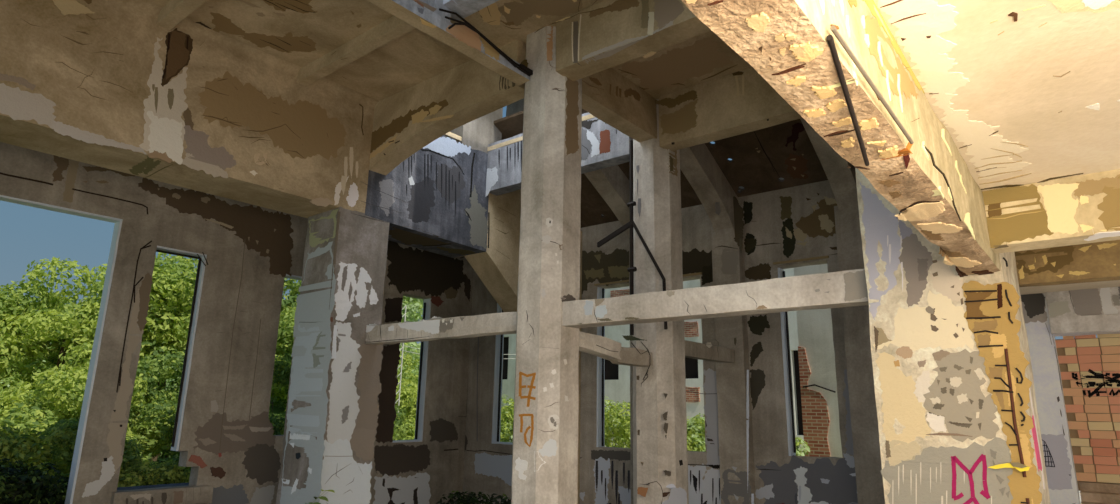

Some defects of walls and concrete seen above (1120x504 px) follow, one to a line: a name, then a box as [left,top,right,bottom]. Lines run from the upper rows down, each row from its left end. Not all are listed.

spalling [161,28,193,86]
peeling [745,12,823,62]
crack [824,129,855,137]
peeling [786,76,899,158]
crack [847,164,903,176]
crack [899,147,961,221]
crack [959,131,1083,190]
spalling [52,155,294,277]
peeling [894,201,963,234]
peeling [1037,183,1116,252]
spalling [873,254,1089,504]
peeling [664,460,737,504]